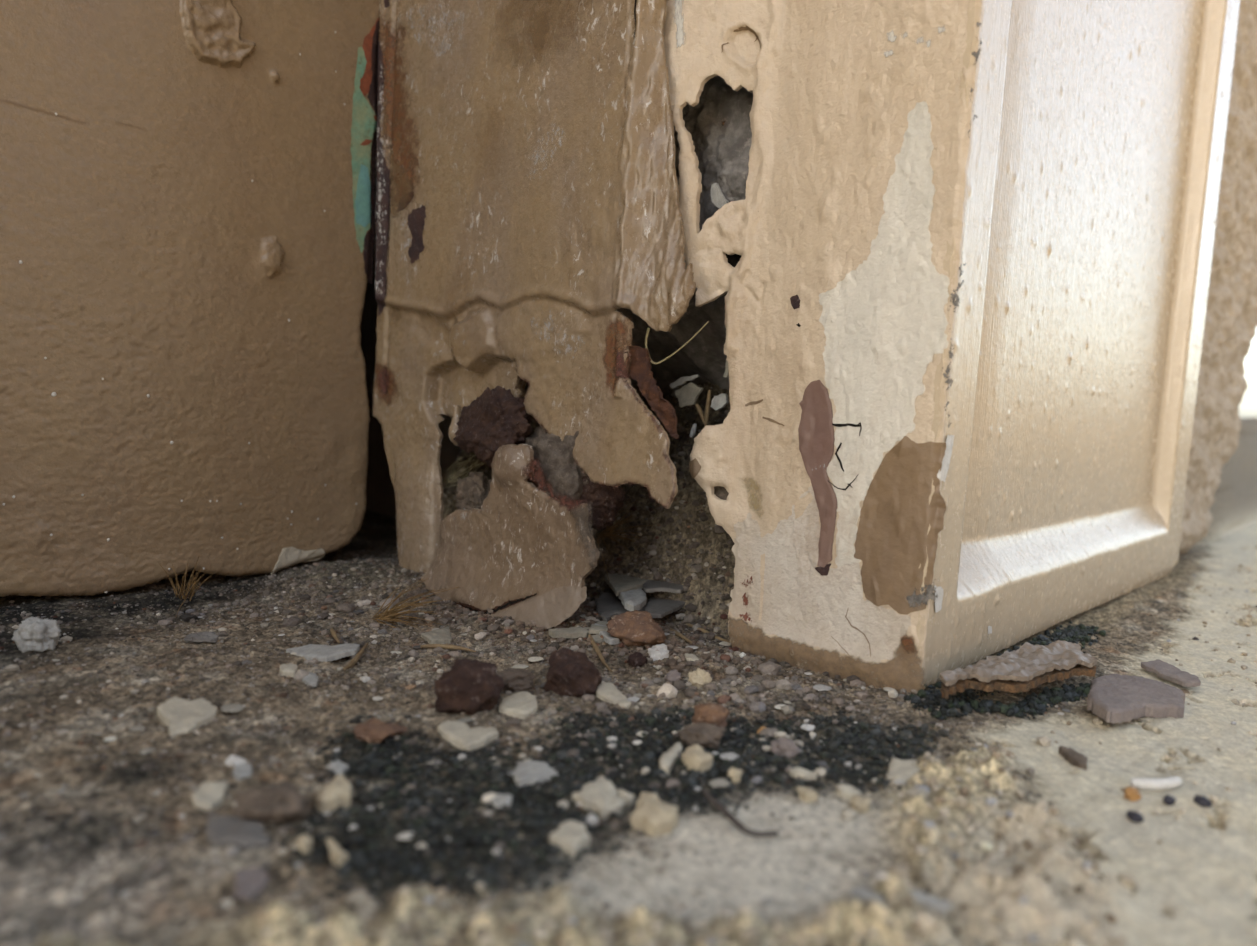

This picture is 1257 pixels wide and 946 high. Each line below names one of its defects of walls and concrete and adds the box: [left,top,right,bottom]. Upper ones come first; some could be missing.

hole [674,76,753,231]
peeling [675,382,729,411]
peeling [726,102,950,664]
peeling [937,435,954,483]
spalling [714,486,729,500]
peeling [643,580,684,594]